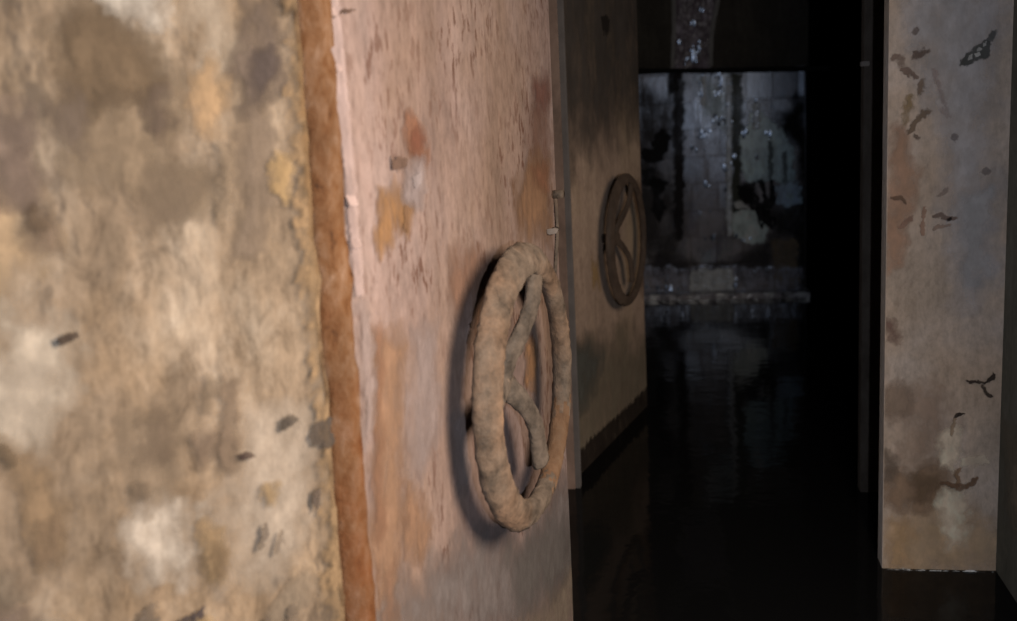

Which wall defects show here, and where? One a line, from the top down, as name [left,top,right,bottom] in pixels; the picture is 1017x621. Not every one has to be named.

peeling [960,30,996,66]
damp [640,0,805,291]
crack [966,373,996,398]
crack [950,412,965,436]
crack [139,603,205,621]